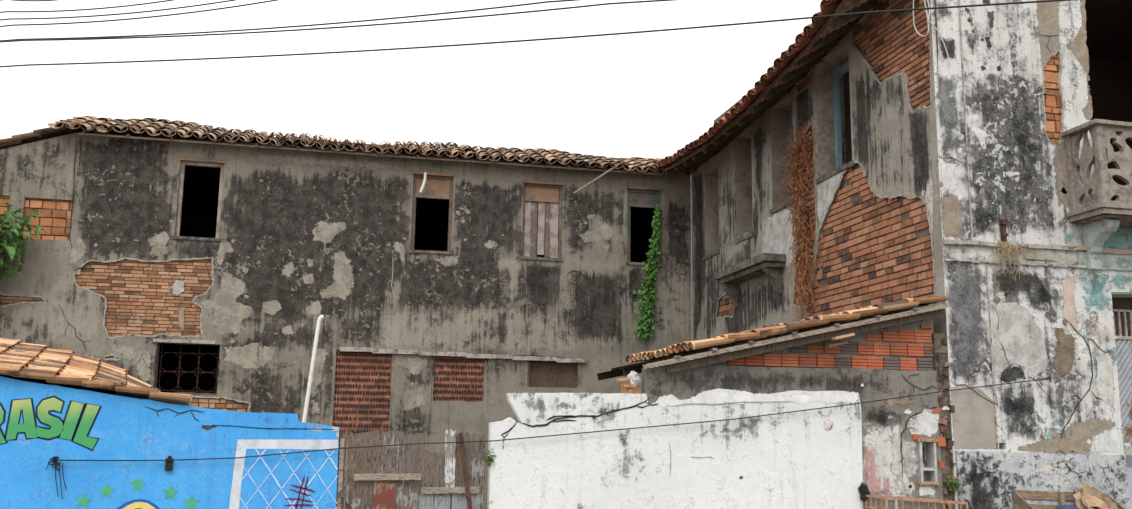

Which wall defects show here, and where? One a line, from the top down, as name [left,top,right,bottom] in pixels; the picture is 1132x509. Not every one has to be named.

water stain [1006,108,1041,188]
flaking render [1042,0,1093,208]
flaking render [762,122,965,317]
water stain [975,208,993,234]
flaking render [65,220,282,381]
peeling [281,221,361,335]
water stain [498,312,513,343]
water stain [526,262,638,342]
water stain [948,265,988,375]
water stain [996,273,1055,317]
peeling [992,271,1131,476]
water stain [970,466,997,509]